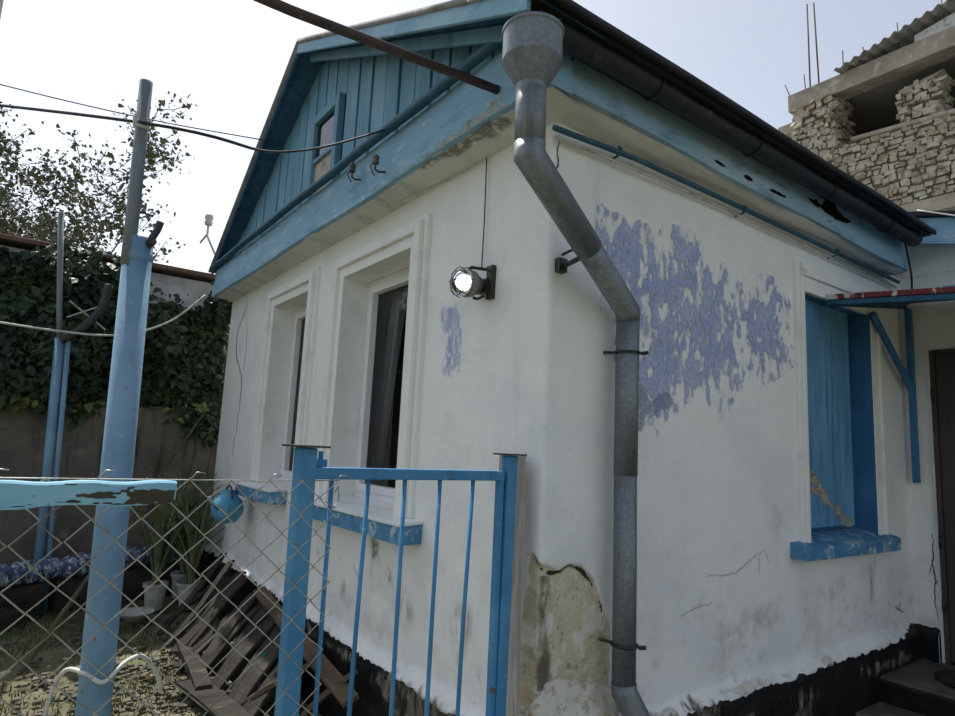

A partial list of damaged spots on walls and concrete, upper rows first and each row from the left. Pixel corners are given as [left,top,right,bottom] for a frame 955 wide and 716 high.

peeling [441,307,461,374]
peeling [596,204,794,430]
crack [706,549,769,577]
crack [930,533,938,618]
flaking render [518,554,620,716]
peeling [669,695,720,716]